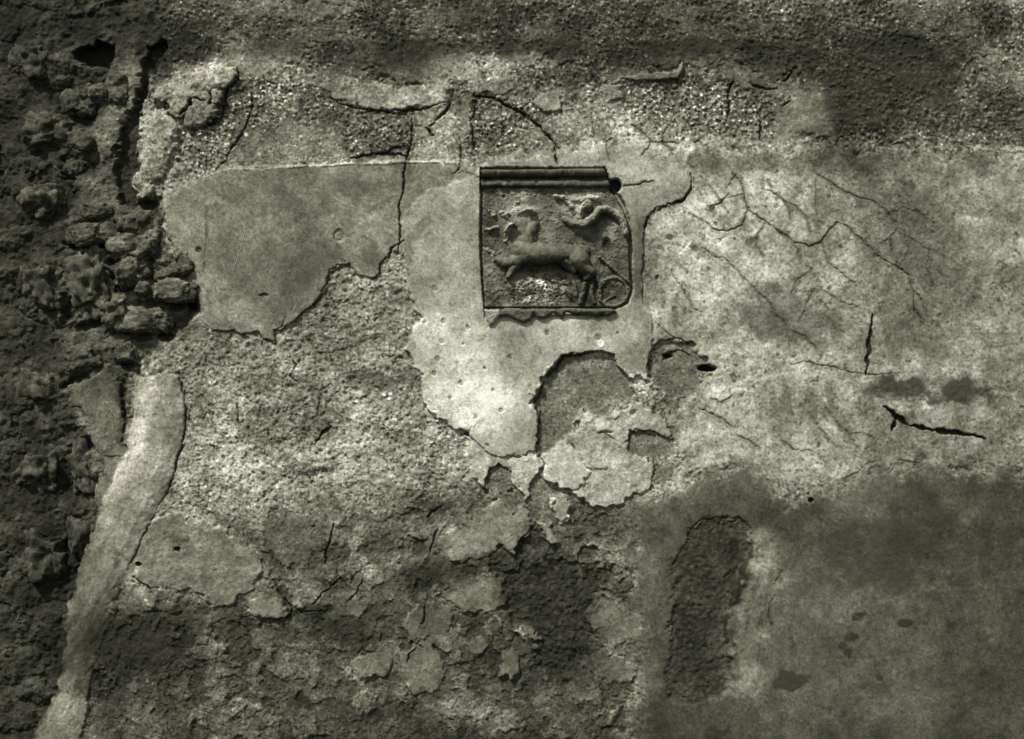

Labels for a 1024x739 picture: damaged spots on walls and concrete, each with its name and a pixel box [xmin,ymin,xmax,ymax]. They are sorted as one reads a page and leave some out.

crack [333,96,559,280]
crack [632,125,932,375]
peeling [423,396,478,431]
crack [883,406,983,439]
spalling [263,510,315,562]
spalling [485,334,716,689]
peeling [251,593,286,619]
peeling [329,600,365,622]
spalling [664,516,754,705]
peeling [446,634,488,665]